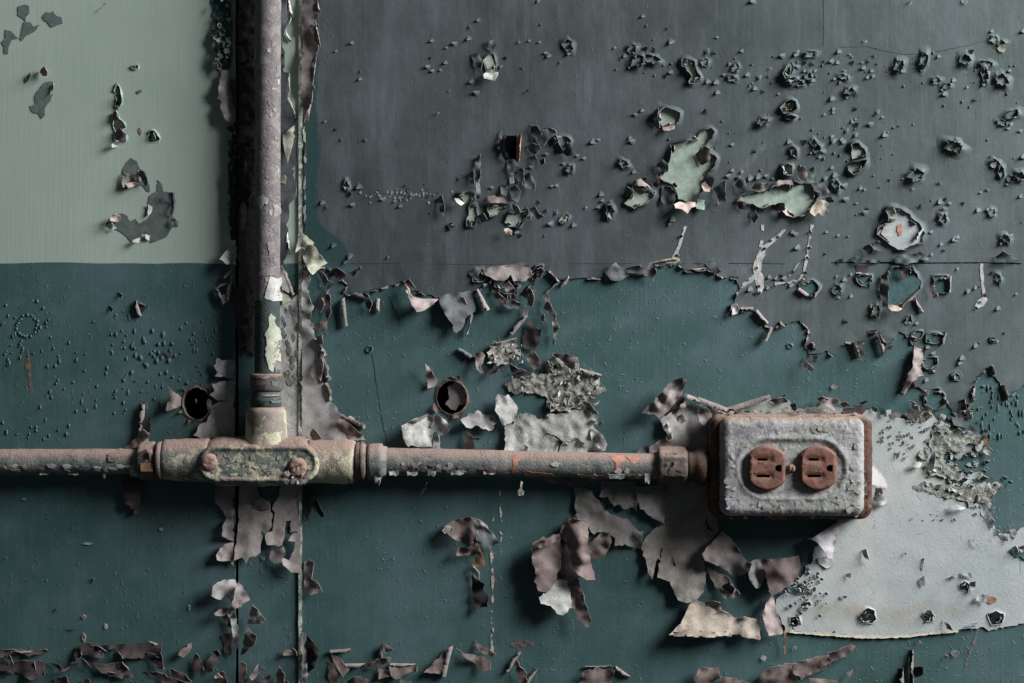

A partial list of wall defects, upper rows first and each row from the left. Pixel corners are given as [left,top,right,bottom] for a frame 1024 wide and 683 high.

peeling [1,5,63,54]
peeling [111,83,161,148]
peeling [107,158,178,243]
peeling [194,0,607,467]
peeling [587,104,835,342]
peeling [769,50,809,125]
peeling [843,139,871,179]
peeling [832,202,1022,313]
peeling [208,452,324,596]
peeling [442,516,500,613]
flaking render [531,323,1024,683]
peeling [0,579,495,683]